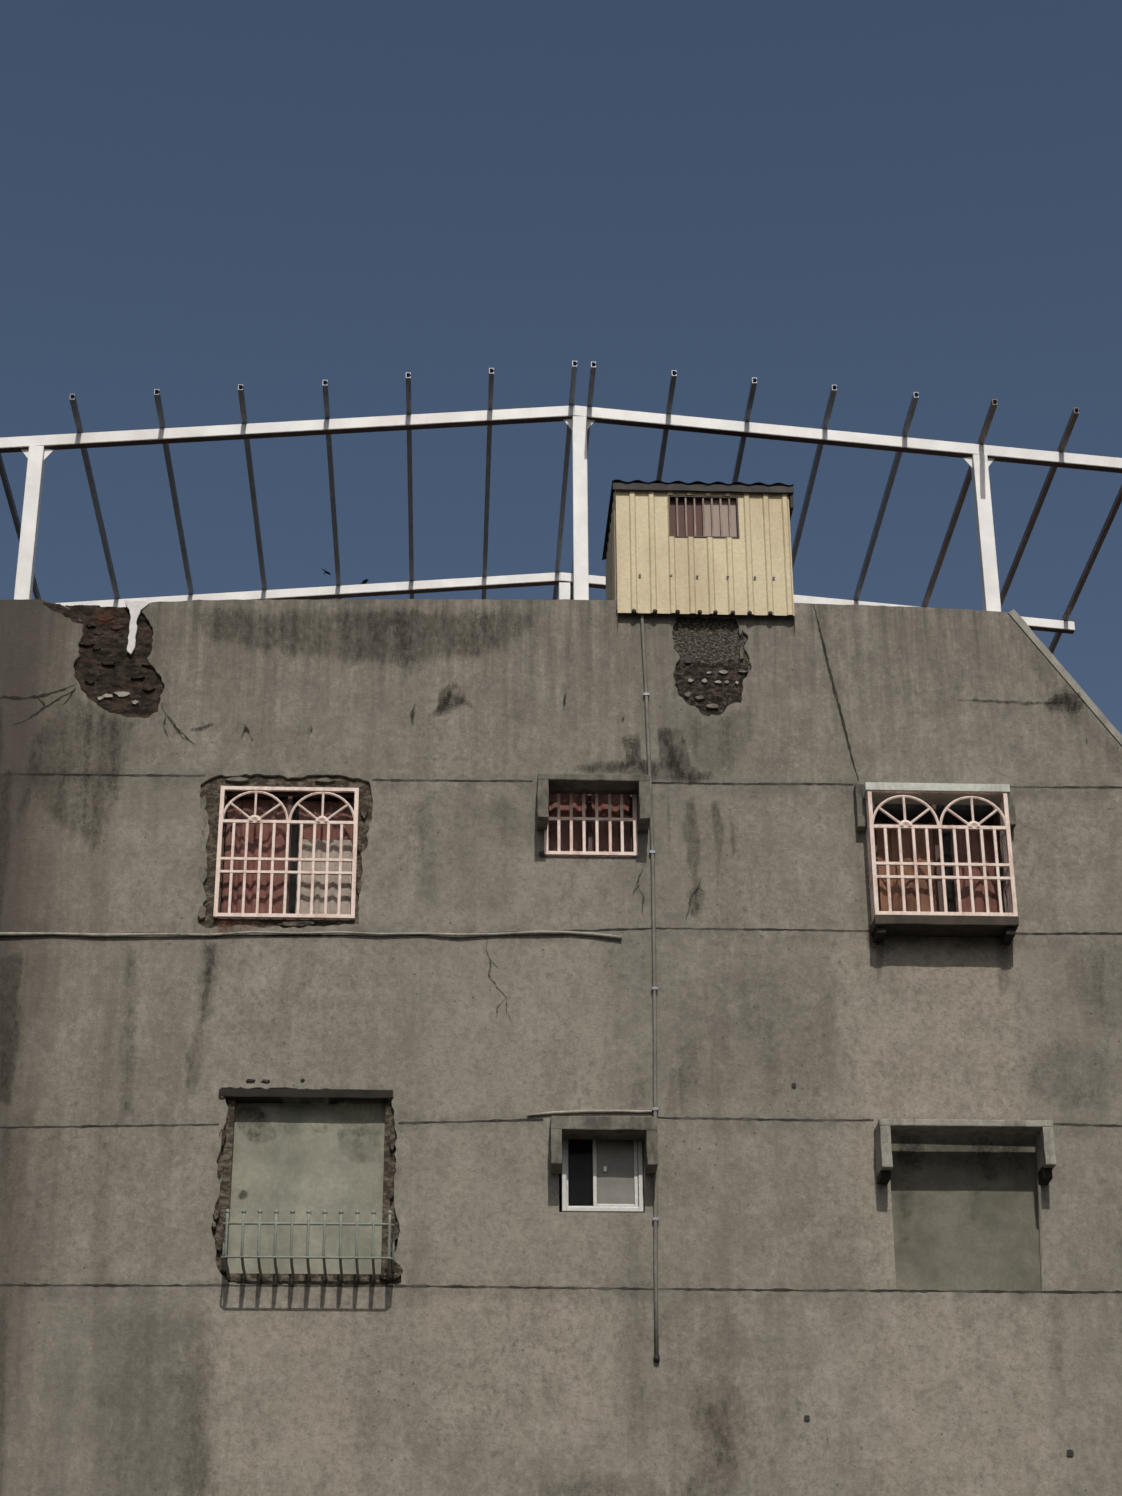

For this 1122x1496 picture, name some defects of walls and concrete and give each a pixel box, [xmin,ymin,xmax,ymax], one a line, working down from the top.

crack [1,684,76,725]
spalling [43,600,165,718]
spalling [672,616,751,716]
flaking render [198,775,373,928]
crack [486,940,507,1013]
flaking render [212,1094,403,1285]